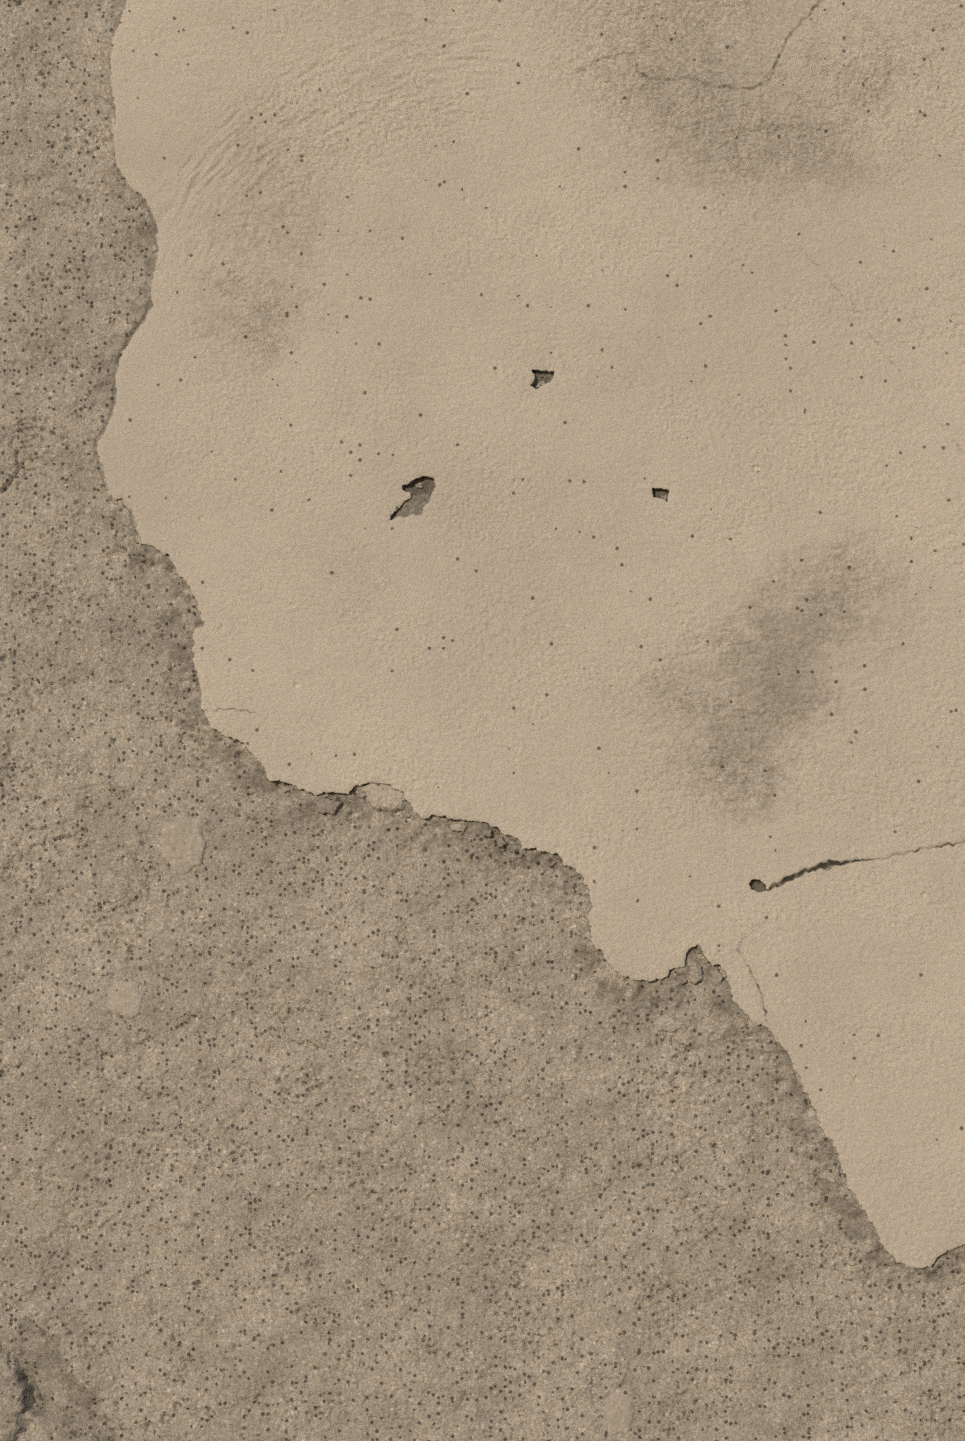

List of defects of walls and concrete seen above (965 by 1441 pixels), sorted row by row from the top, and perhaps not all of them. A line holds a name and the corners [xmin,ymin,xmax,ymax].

spalling [95,3,159,499]
spalling [530,369,555,389]
spalling [390,476,436,521]
spalling [652,488,669,502]
spalling [131,515,609,965]
spalling [749,879,766,892]
crack [765,858,879,890]
spalling [677,945,965,1285]